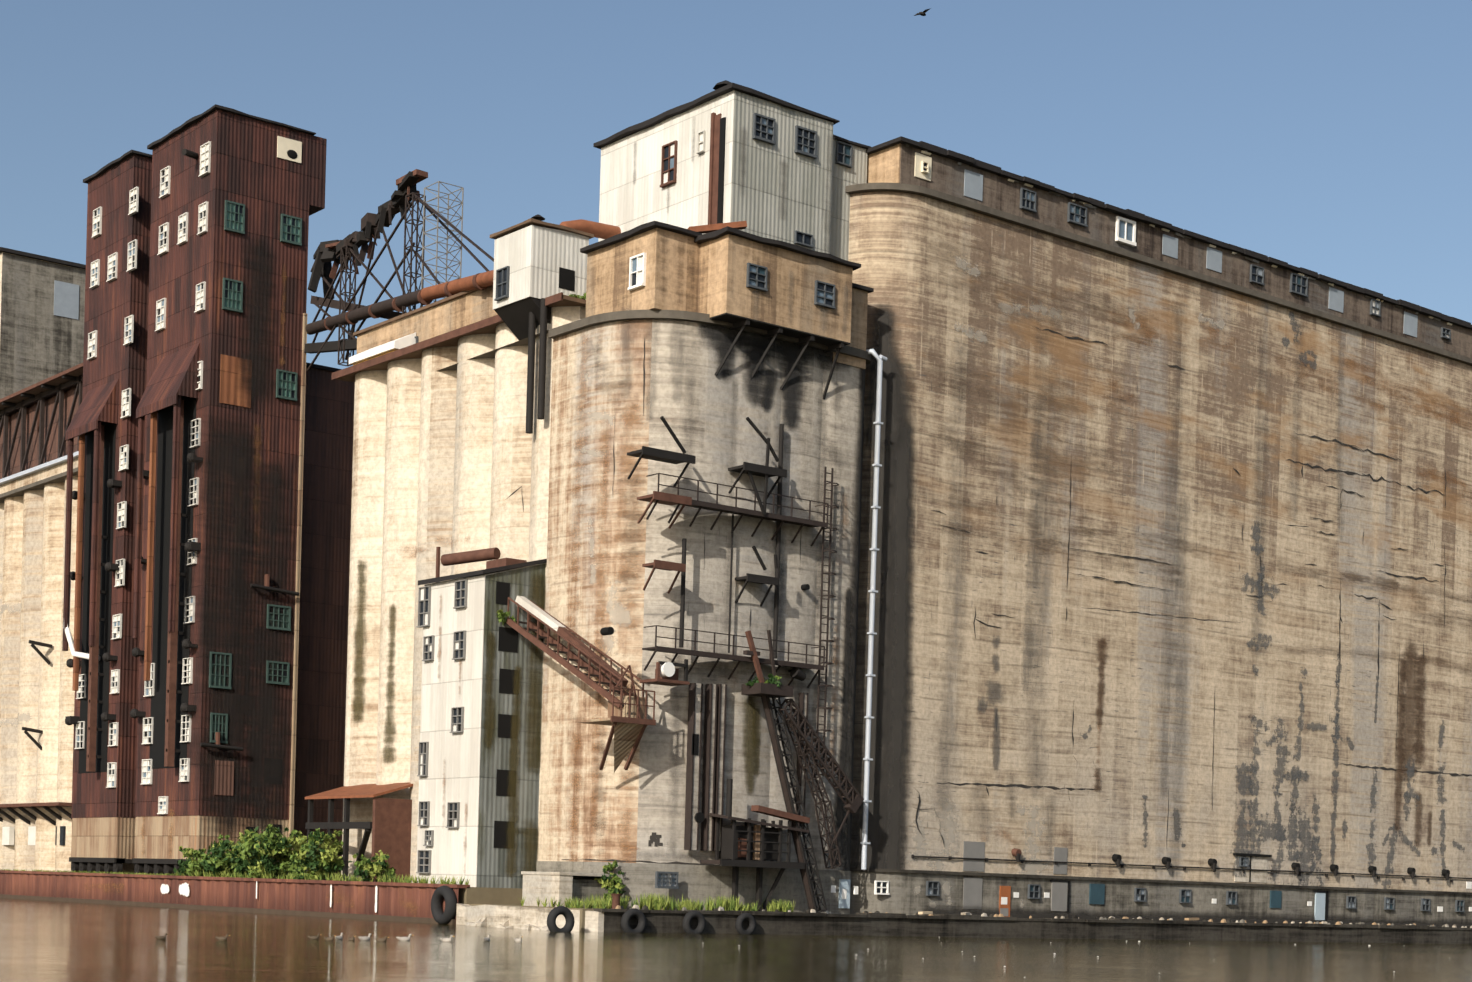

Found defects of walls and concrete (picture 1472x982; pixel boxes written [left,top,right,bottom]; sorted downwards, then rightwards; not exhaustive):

water stain [700,306,912,871]
crack [1066,431,1472,786]